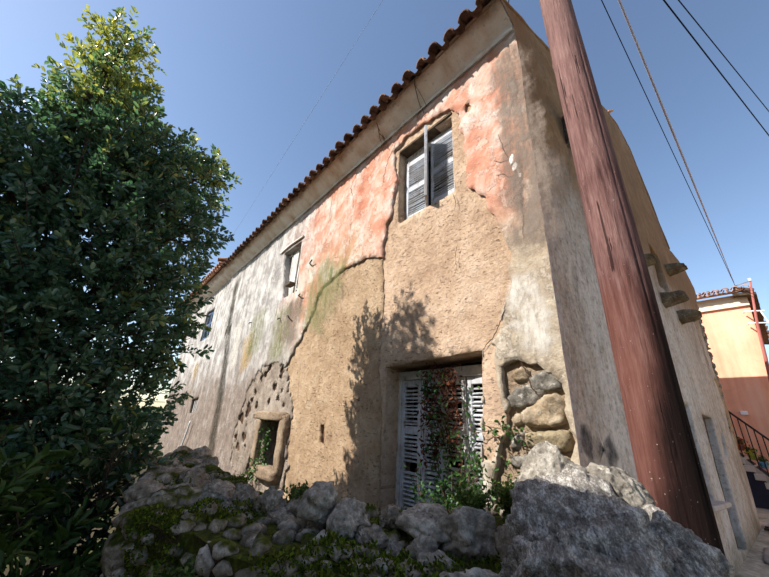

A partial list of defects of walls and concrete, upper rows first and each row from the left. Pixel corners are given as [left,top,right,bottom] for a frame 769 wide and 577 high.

water stain [278,298,302,349]
flaking render [230,105,512,514]
spalling [495,360,581,502]